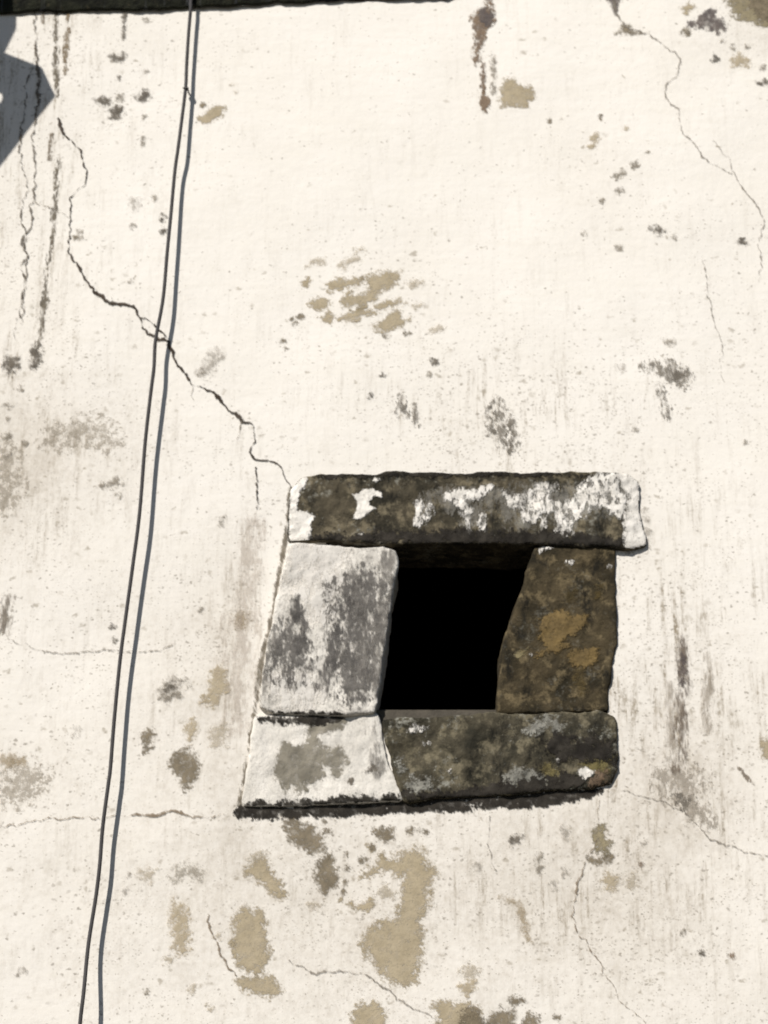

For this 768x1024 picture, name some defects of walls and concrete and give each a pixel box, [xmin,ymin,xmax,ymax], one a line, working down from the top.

water stain [41,13,71,98]
peeling [496,78,535,109]
crack [613,2,765,275]
water stain [1,133,61,373]
peeling [290,246,425,338]
crack [13,12,292,806]
crack [0,809,215,827]
peeling [206,906,281,1002]
peeling [281,817,437,987]
crack [289,960,437,1022]
crack [571,790,768,1022]